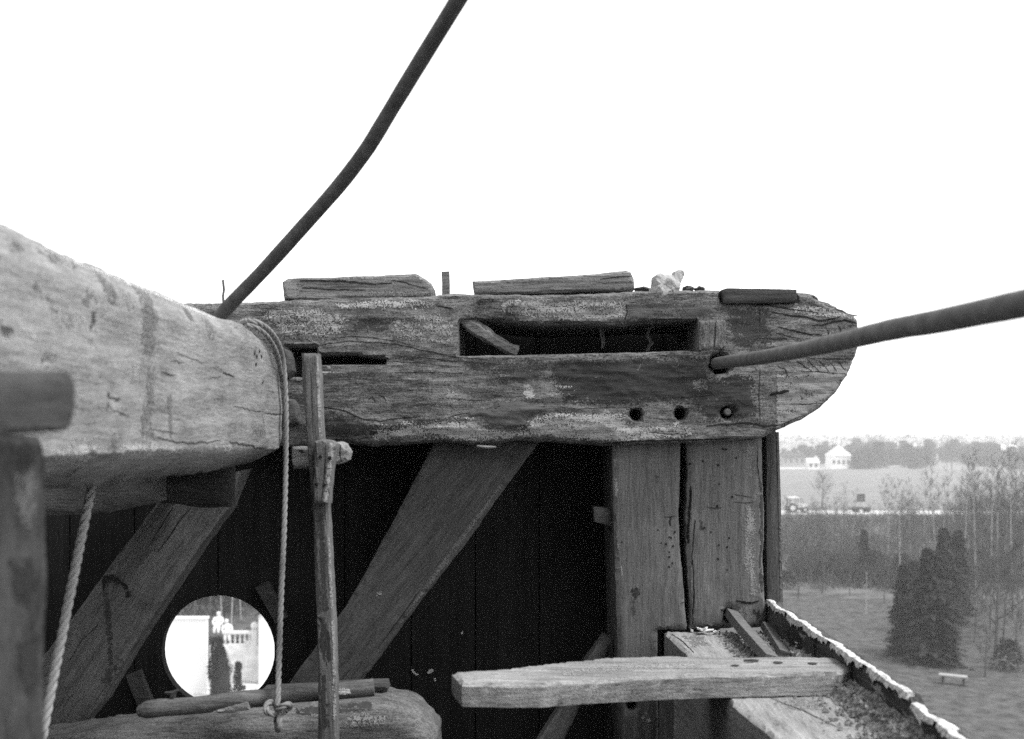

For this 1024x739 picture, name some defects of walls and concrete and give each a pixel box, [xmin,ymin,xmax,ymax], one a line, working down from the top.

crack [599,304,856,652]